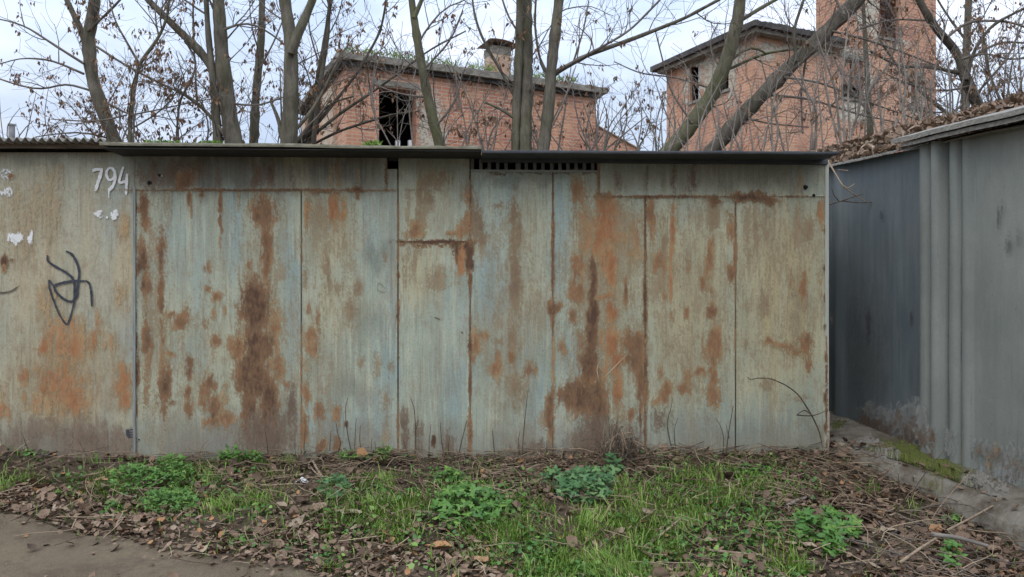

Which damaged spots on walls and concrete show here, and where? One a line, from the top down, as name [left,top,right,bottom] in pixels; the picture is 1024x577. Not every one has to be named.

rust [0,161,828,457]